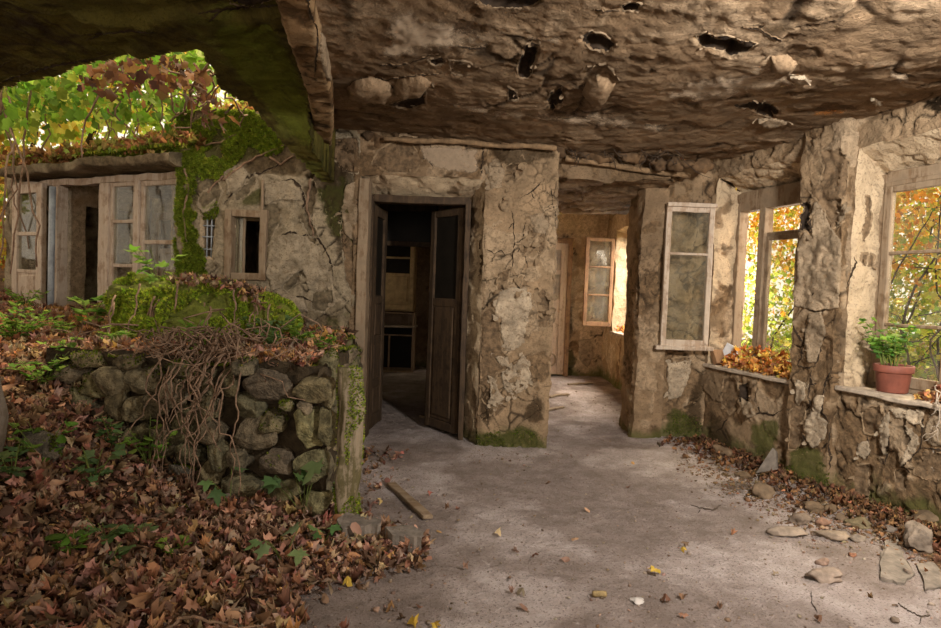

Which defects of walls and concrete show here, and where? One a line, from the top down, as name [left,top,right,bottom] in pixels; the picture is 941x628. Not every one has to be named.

spalling [506,40,542,102]
spalling [580,30,620,83]
spalling [695,31,758,56]
spalling [546,86,564,111]
flaking render [733,100,794,129]
crack [224,160,334,277]
crack [487,180,557,275]
spalling [519,216,548,265]
crack [846,258,858,289]
flaking render [477,267,558,416]
spalling [848,404,941,499]